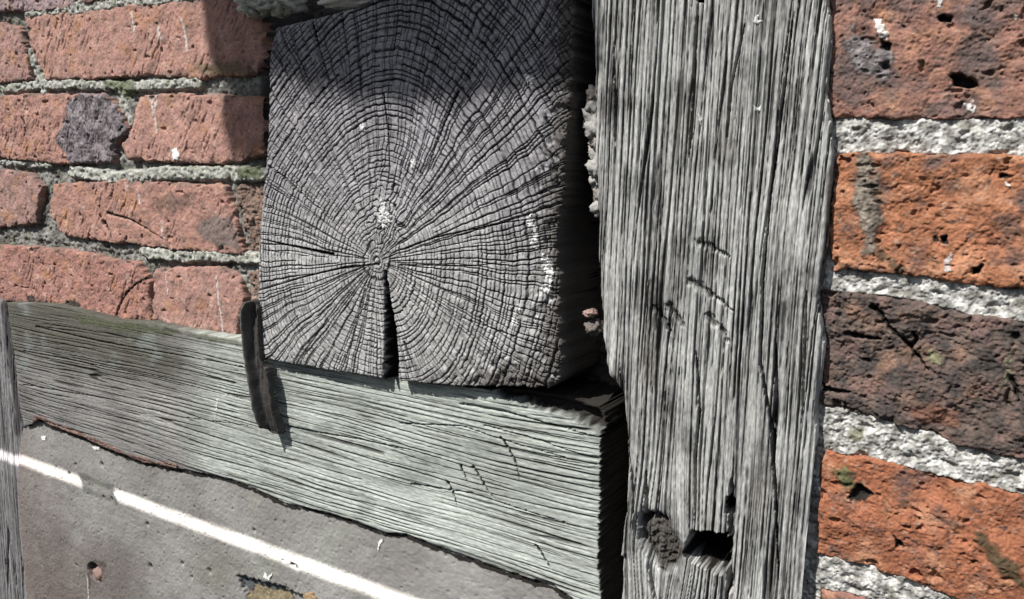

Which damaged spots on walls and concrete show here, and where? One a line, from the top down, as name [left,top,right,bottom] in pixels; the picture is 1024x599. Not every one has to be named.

crack [117,278,148,315]
crack [844,305,927,367]